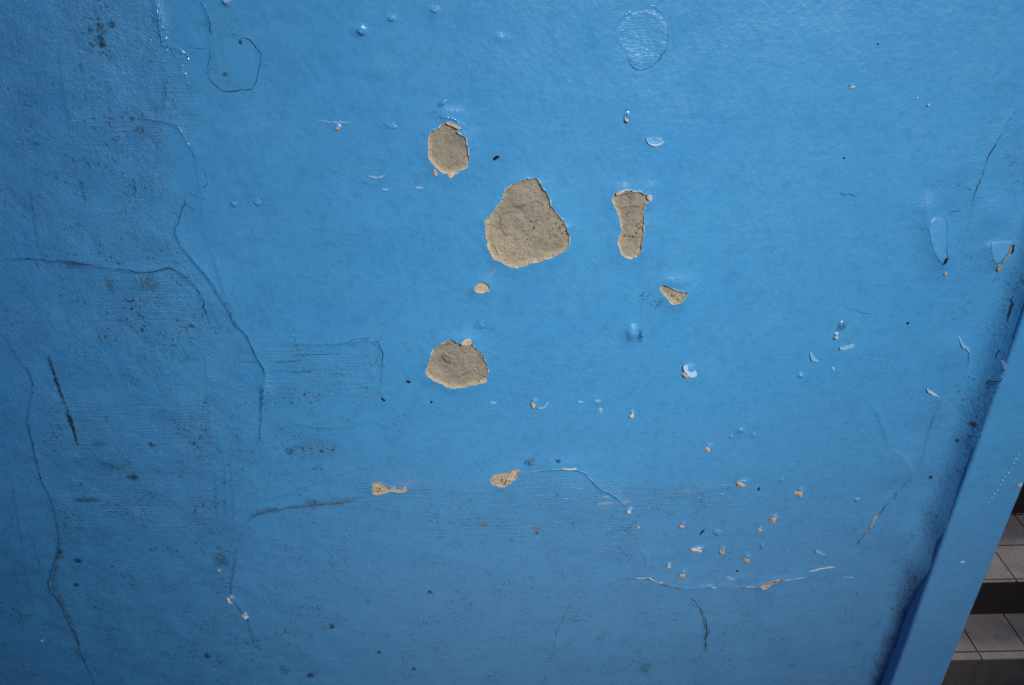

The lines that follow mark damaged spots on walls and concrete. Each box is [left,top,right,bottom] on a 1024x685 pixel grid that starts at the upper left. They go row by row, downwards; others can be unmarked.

crack [165,4,273,98]
peeling [426,115,471,179]
crack [949,110,1017,215]
peeling [483,177,572,269]
peeling [610,189,652,260]
peeling [658,284,689,306]
crack [10,258,384,440]
peeling [424,338,490,389]
peeling [371,481,409,496]
peeling [489,468,538,488]
crack [36,528,94,683]